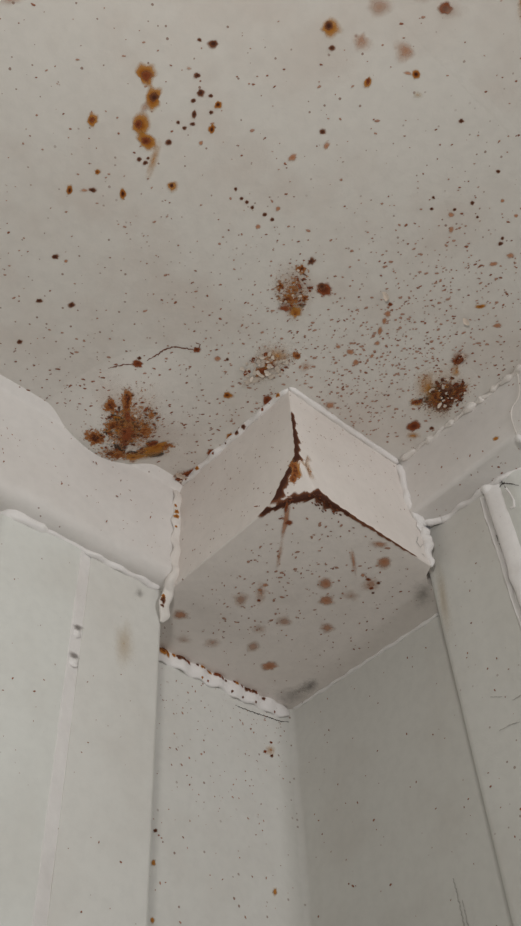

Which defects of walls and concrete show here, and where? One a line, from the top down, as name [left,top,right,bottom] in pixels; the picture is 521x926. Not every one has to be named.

corrosion [133,64,173,164]
crack [110,343,201,368]
corrosion [20,213,521,483]
corrosion [159,412,417,779]